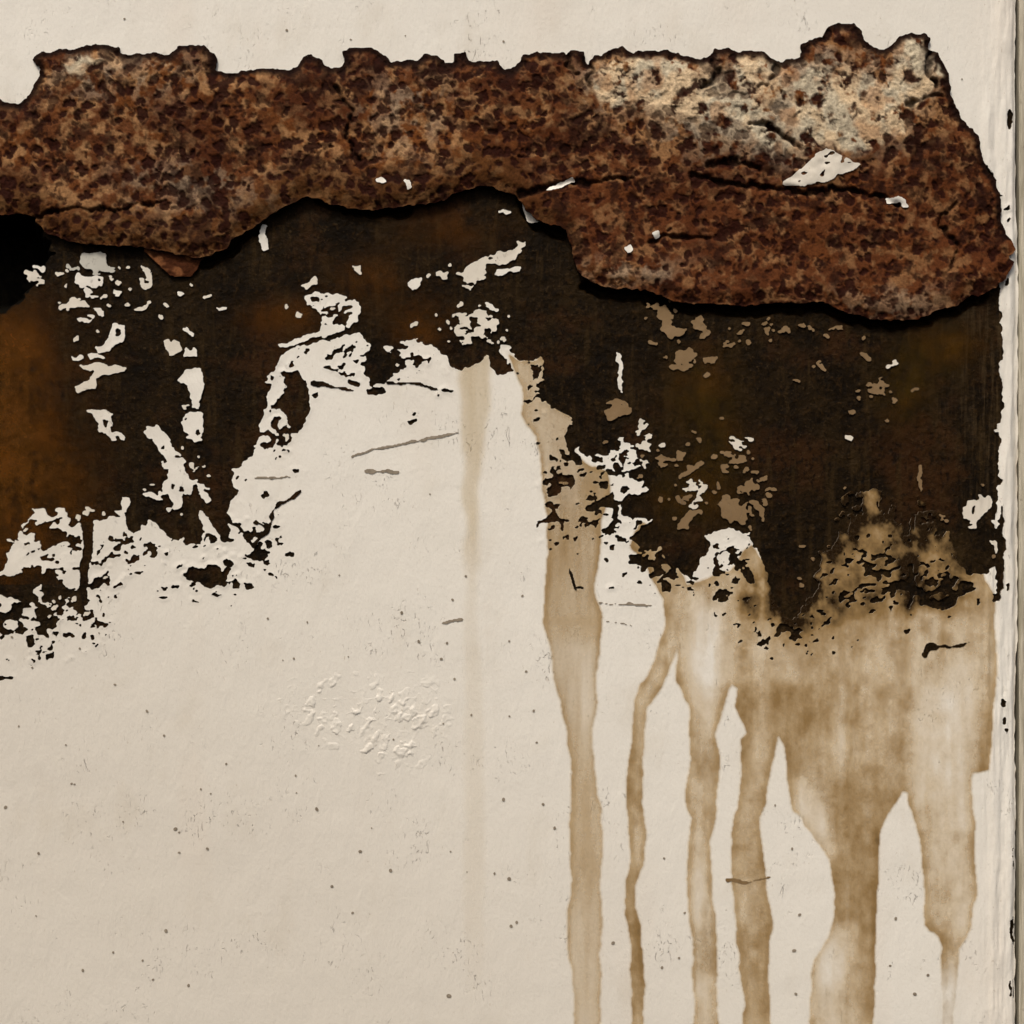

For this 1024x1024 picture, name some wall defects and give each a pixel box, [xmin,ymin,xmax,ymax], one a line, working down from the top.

rust [0,23,1016,321]
rust [0,313,75,553]
peeling [0,187,1009,669]